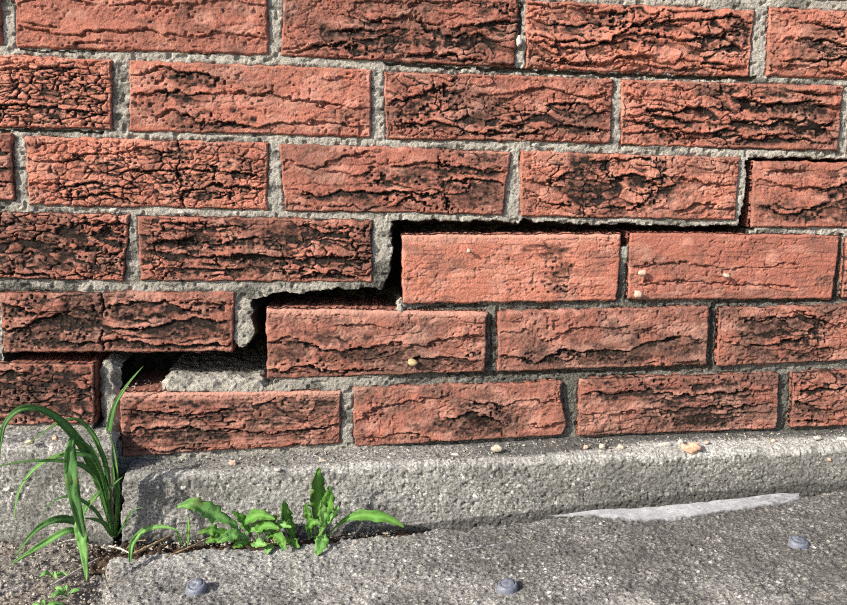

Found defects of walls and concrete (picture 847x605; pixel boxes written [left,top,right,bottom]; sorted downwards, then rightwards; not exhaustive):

crack [748,155,847,163]
crack [120,214,847,390]
crack [3,351,29,362]
spalling [161,350,270,392]
crack [93,414,104,429]
crack [114,503,123,542]